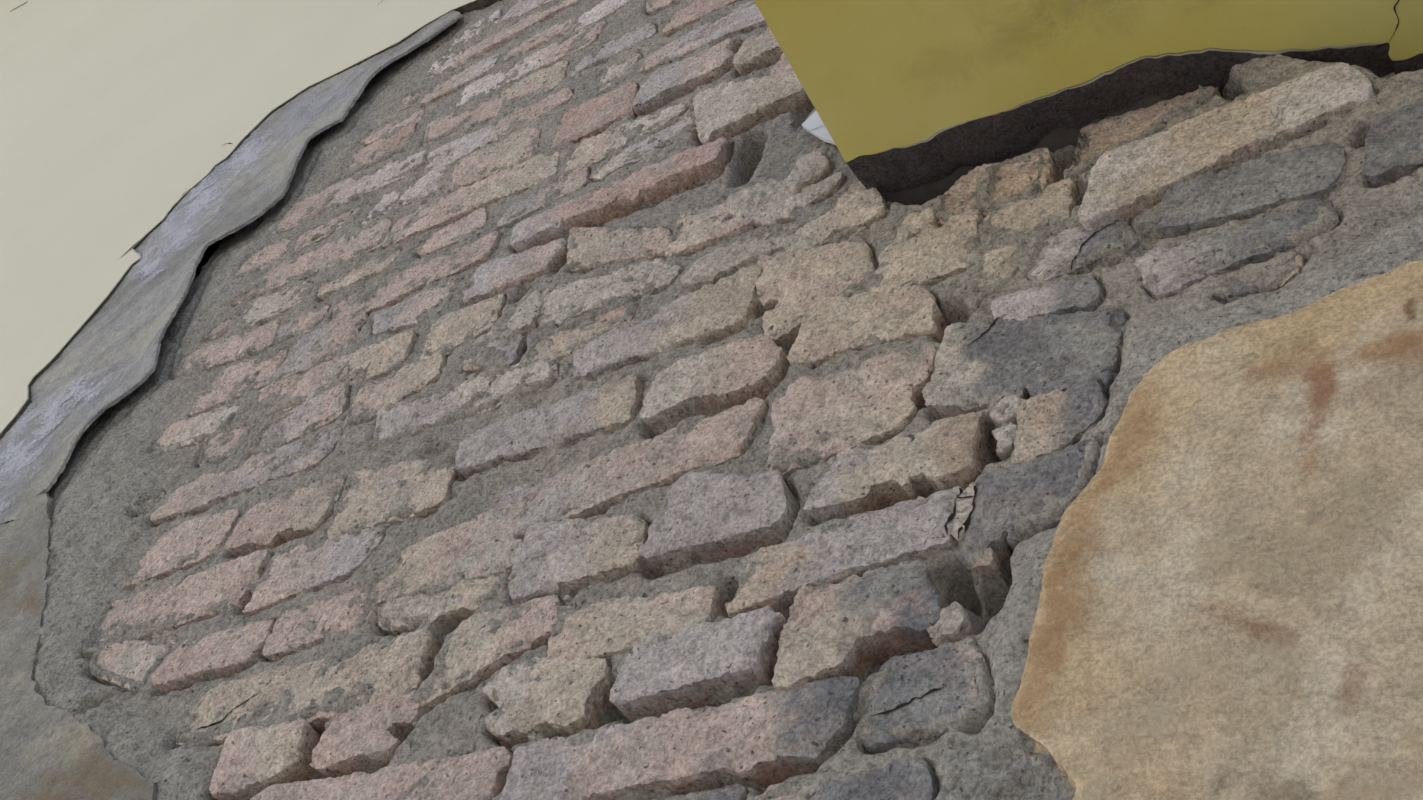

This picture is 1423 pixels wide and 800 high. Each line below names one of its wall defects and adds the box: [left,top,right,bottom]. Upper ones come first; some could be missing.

spalling [846,51,1269,193]
spalling [1281,43,1423,78]
peeling [0,0,476,434]
efflorescence [0,372,112,517]
flaking render [508,481,675,602]
flaking render [900,408,940,439]
flaking render [960,450,1014,497]
flaking render [1005,428,1017,443]
water stain [1200,474,1401,597]
flaking render [482,542,790,746]
flaking render [233,670,563,800]
water stain [1076,645,1293,800]